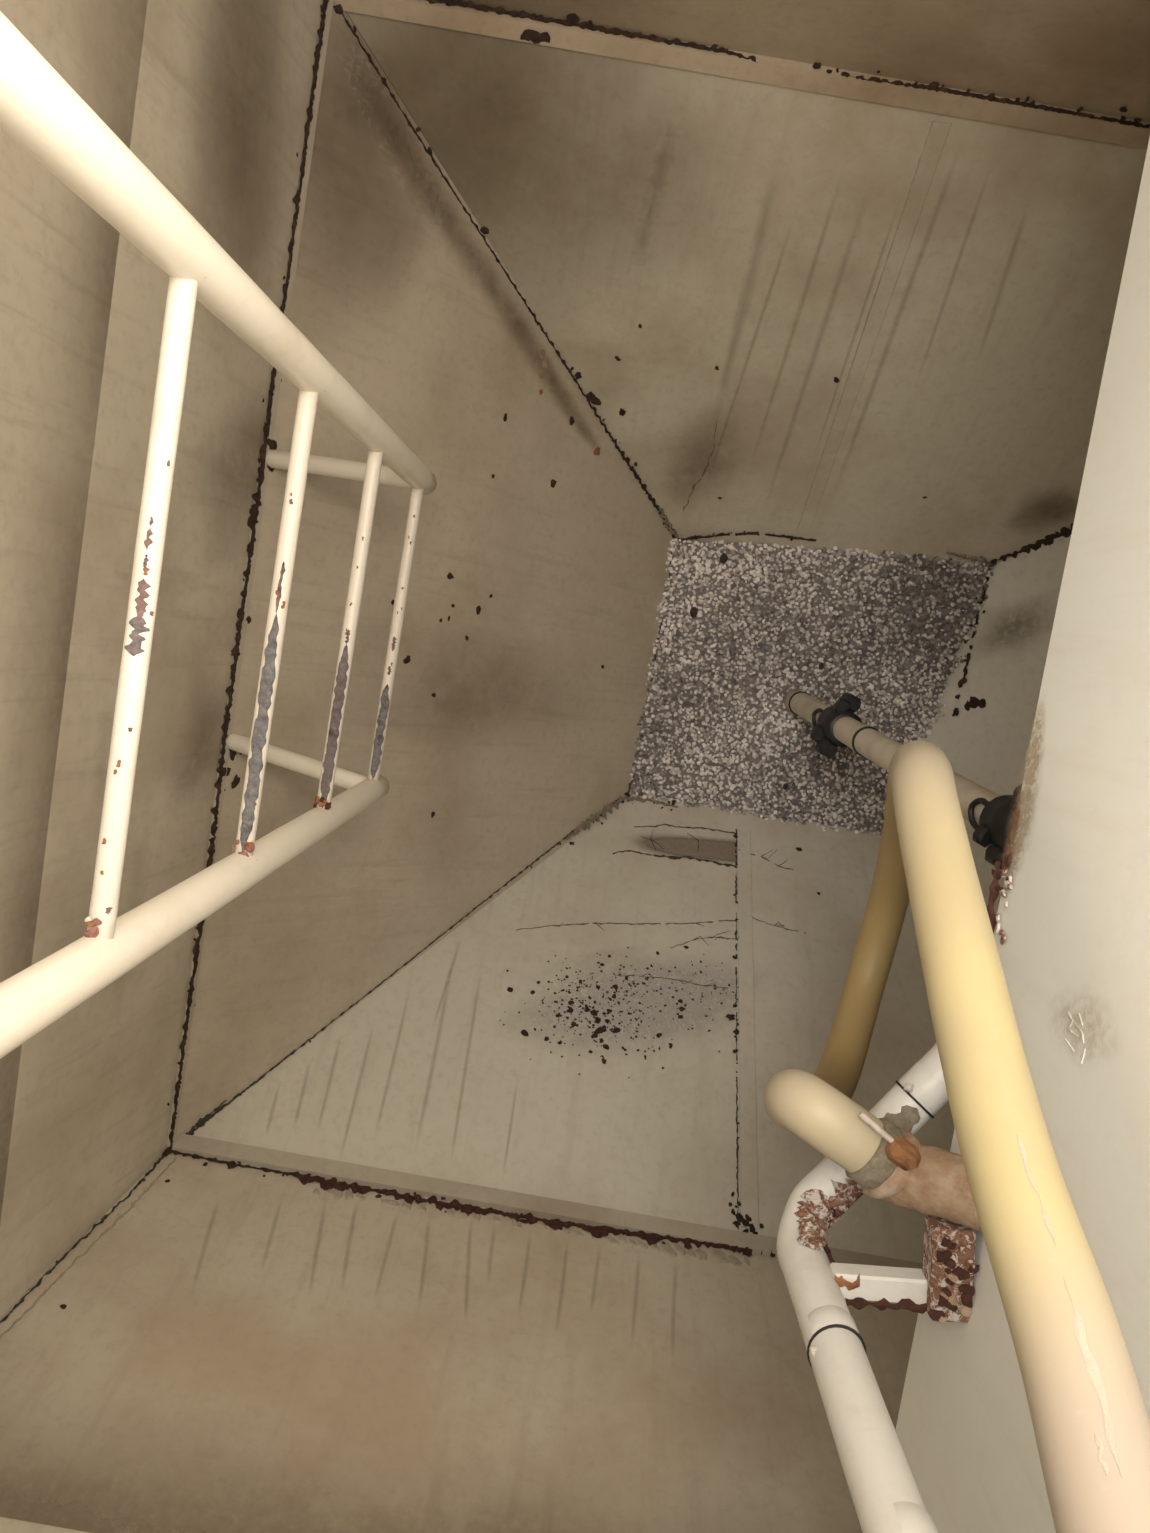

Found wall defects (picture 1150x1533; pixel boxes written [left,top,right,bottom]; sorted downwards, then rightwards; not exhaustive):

corrosion [520,29,551,44]
corrosion [987,720,1041,945]